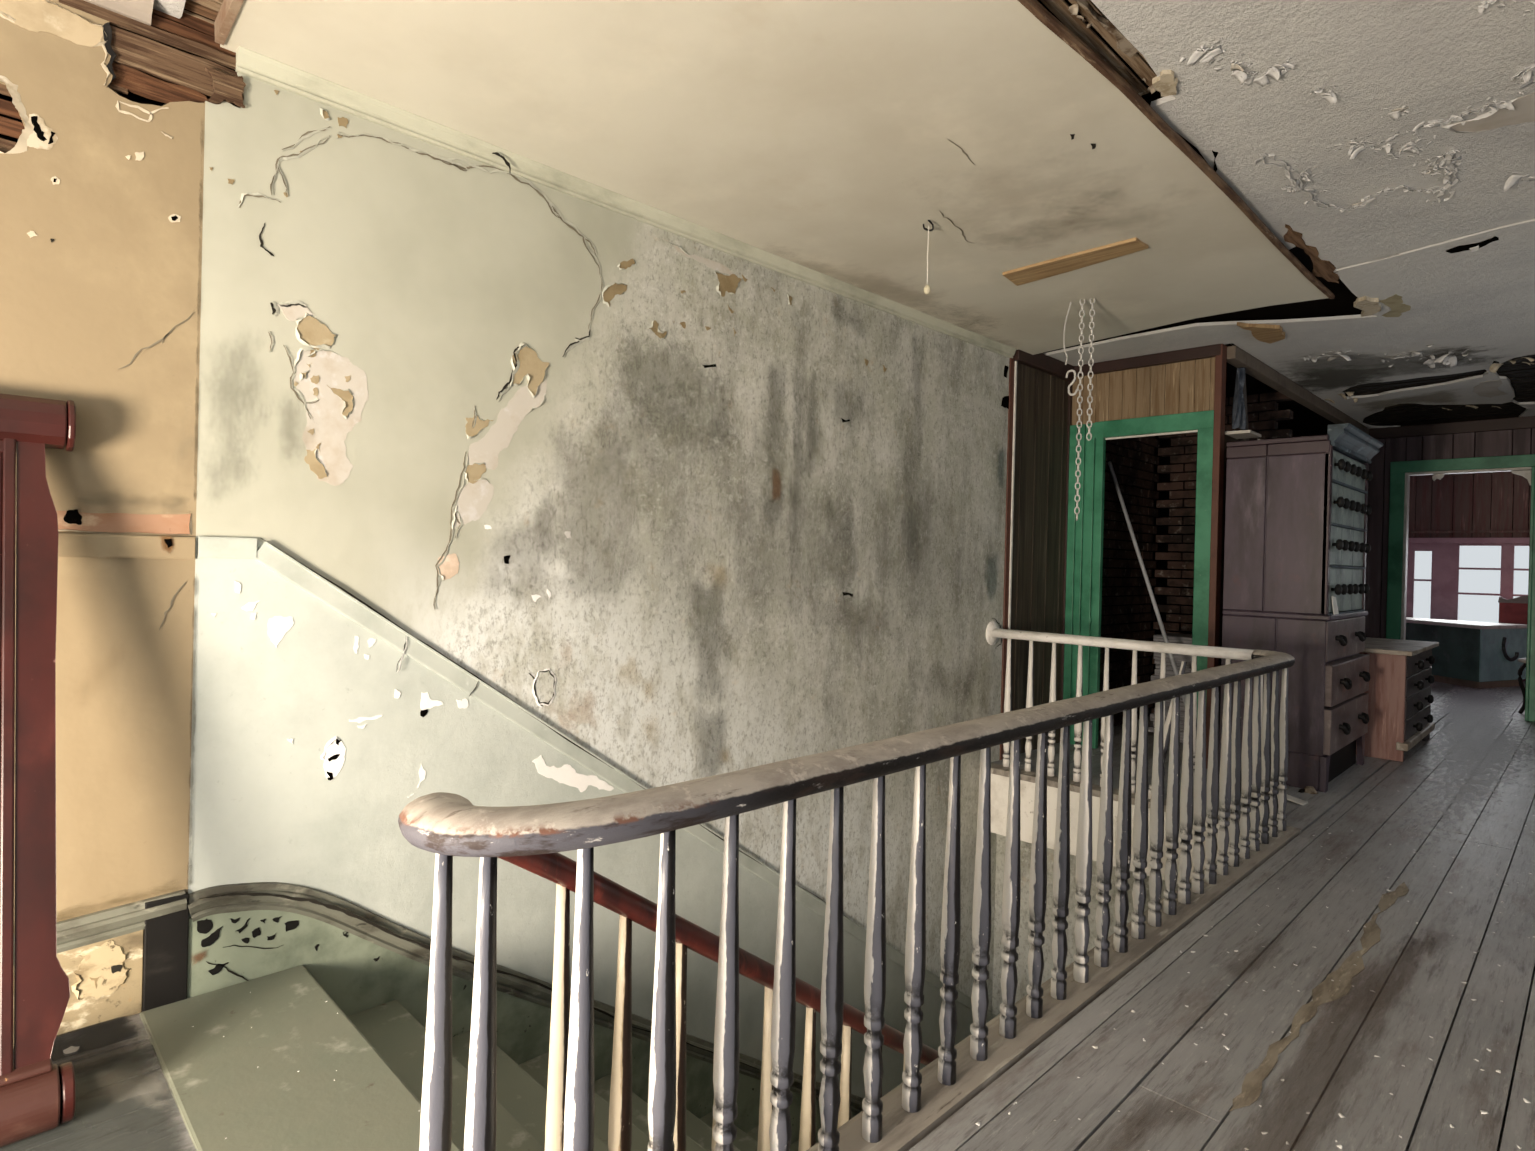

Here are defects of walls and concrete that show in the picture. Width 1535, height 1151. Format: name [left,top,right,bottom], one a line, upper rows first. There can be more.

flaking render [0,75,58,154]
flaking render [0,0,246,139]
peeling [1253,60,1535,212]
crack [238,126,604,358]
crack [119,312,194,369]
crack [269,300,319,419]
flaking render [277,304,369,486]
crack [433,345,527,609]
flaking render [451,342,550,529]
peeling [532,755,614,792]
peeling [71,940,132,1000]
peeling [197,916,299,947]